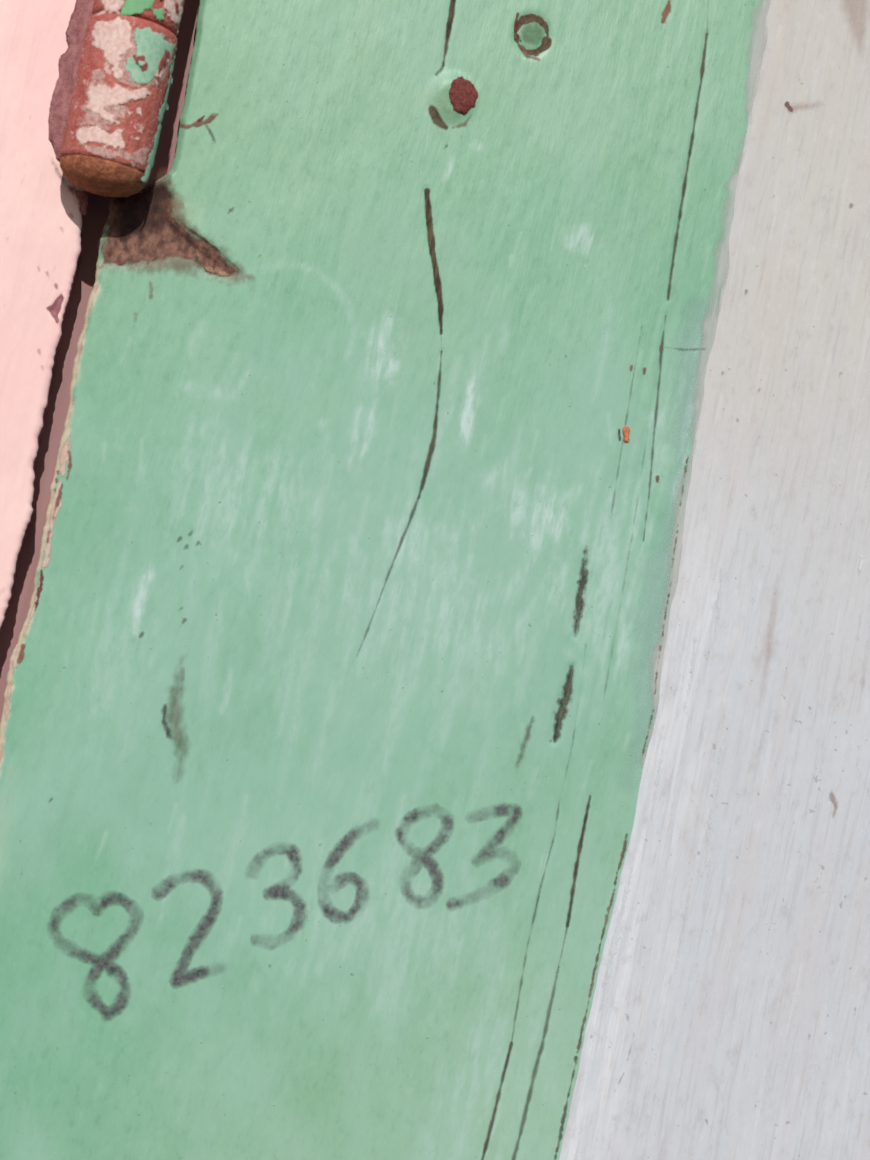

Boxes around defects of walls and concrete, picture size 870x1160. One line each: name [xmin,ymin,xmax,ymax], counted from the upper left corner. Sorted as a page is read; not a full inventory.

crack [442,0,455,66]
rust [514,12,539,60]
crack [667,33,708,299]
crack [386,188,443,580]
crack [650,337,663,484]
crack [566,797,590,927]
crack [555,834,628,1159]
crack [482,1042,512,1160]